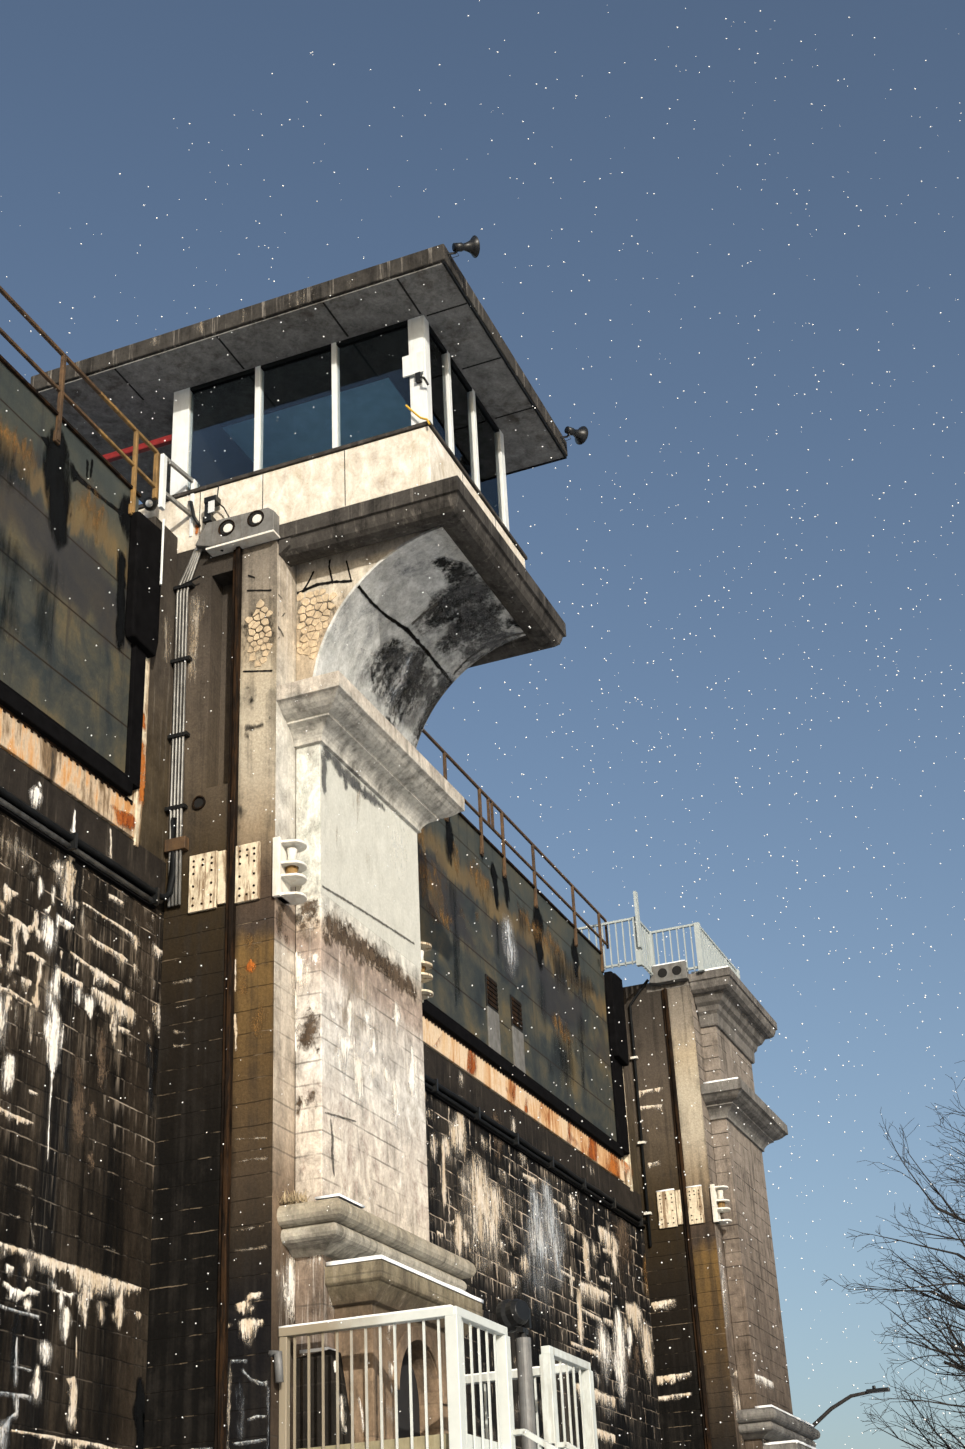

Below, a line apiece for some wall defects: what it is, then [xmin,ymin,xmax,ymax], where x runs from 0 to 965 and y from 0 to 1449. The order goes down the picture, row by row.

crack [243,559,525,684]
water stain [374,575,520,725]
rust [115,713,146,830]
rust [418,829,449,930]
water stain [0,855,137,1168]
water stain [148,1004,161,1108]
water stain [276,900,419,1125]
rust [467,1050,476,1075]
rust [567,1123,630,1178]
water stain [0,1242,141,1399]
water stain [431,1109,690,1407]
water stain [597,1429,615,1443]